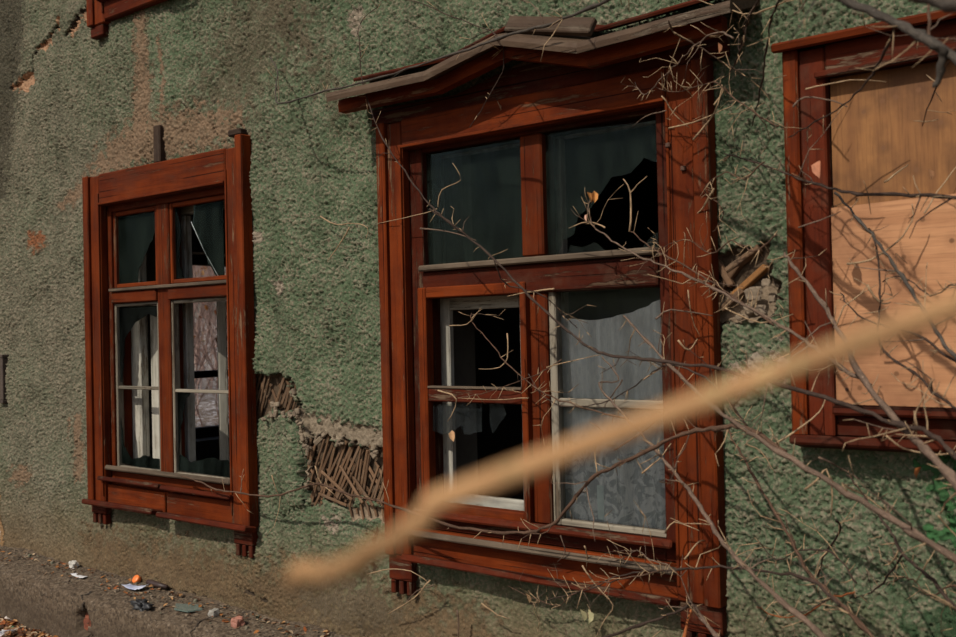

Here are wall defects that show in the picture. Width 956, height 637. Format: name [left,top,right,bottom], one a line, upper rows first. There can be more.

crack [10,9,87,93]
spalling [718,241,784,334]
spalling [727,343,784,373]
spalling [256,373,384,535]